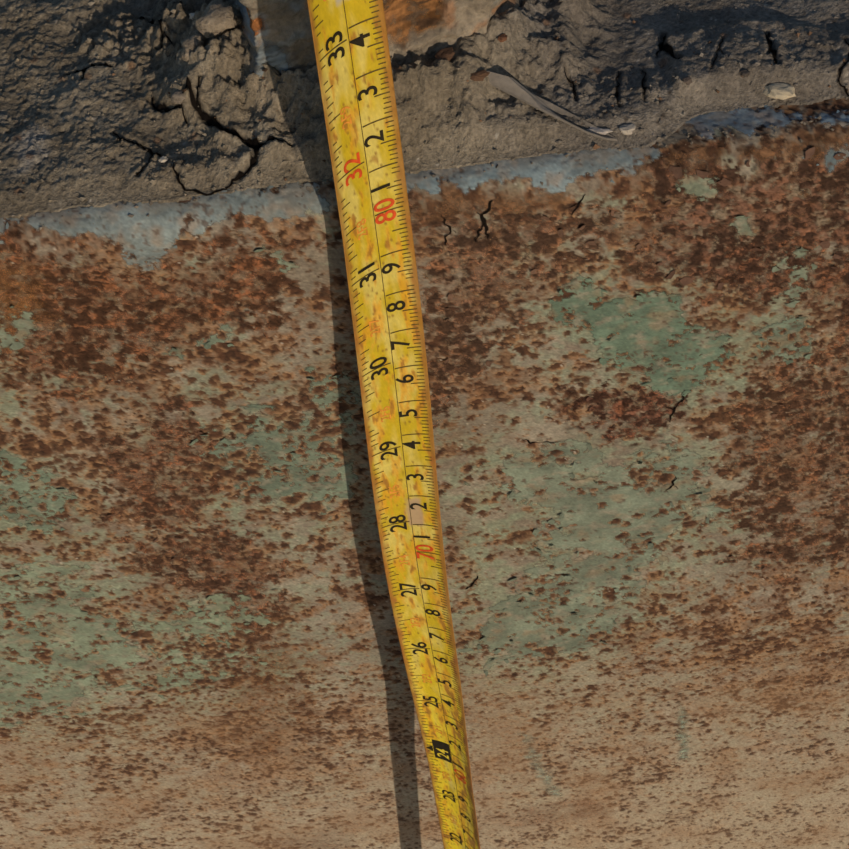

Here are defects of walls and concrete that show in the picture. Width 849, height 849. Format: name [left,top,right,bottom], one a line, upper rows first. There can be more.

crack [69,63,112,79]
corrosion [383,0,443,43]
crack [837,40,849,96]
crack [113,76,292,196]
peeling [0,182,330,273]
crack [475,200,493,242]
corrosion [0,212,298,420]
corrosion [407,130,849,586]
peeling [546,271,736,396]
corrosion [94,395,291,638]
peeling [459,439,731,676]
peeling [0,562,278,733]